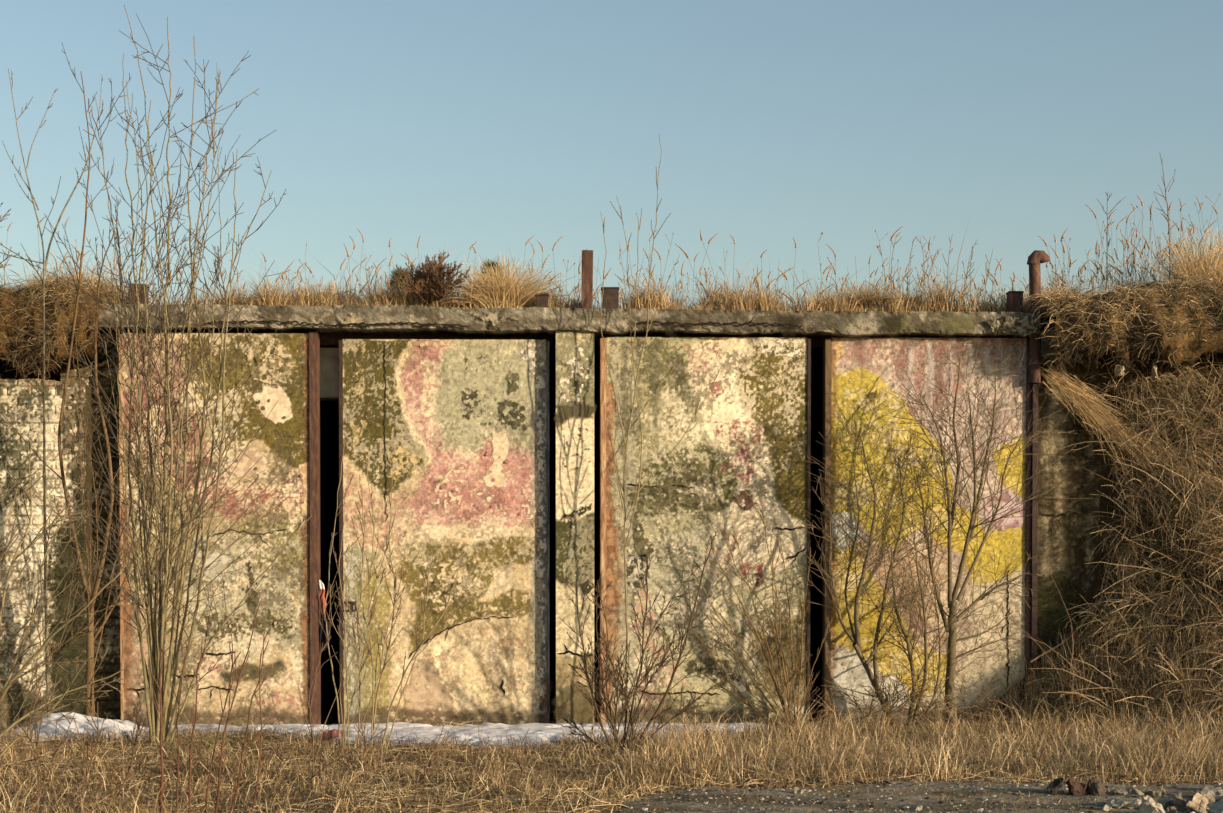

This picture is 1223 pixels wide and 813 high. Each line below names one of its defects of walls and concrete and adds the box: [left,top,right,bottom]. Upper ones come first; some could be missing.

peeling [246,338,294,424]
peeling [752,338,806,357]
peeling [127,405,165,455]
leakage [0,505,88,726]
peeling [197,561,289,639]
crack [213,529,287,546]
peeling [419,563,473,612]
peeling [431,340,594,723]
corrosion [606,383,623,723]
peeling [624,483,701,593]
peeling [733,489,758,511]
leakage [1038,377,1086,601]